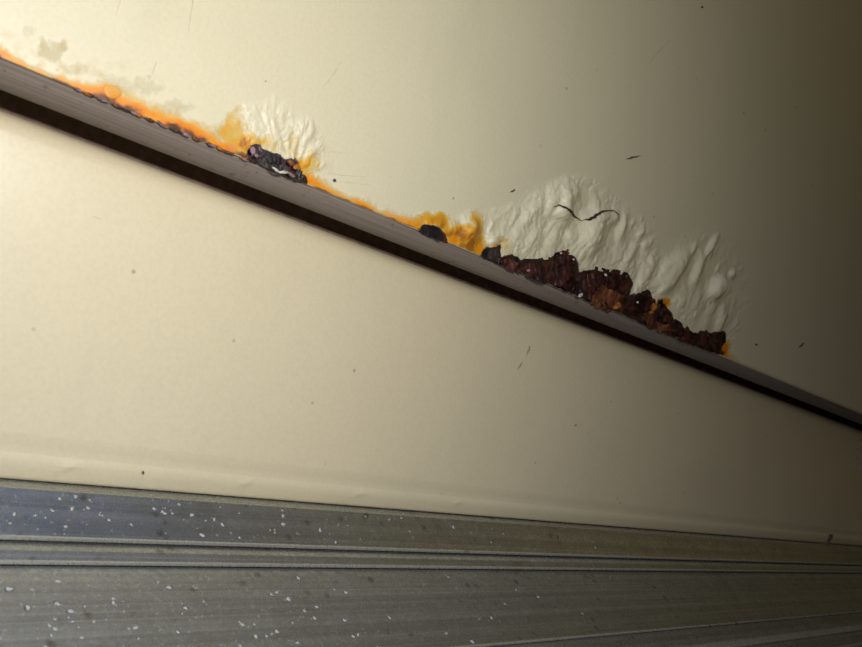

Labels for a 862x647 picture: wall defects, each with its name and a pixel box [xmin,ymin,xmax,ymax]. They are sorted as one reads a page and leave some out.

corrosion [0,48,731,359]
crack [554,204,619,221]